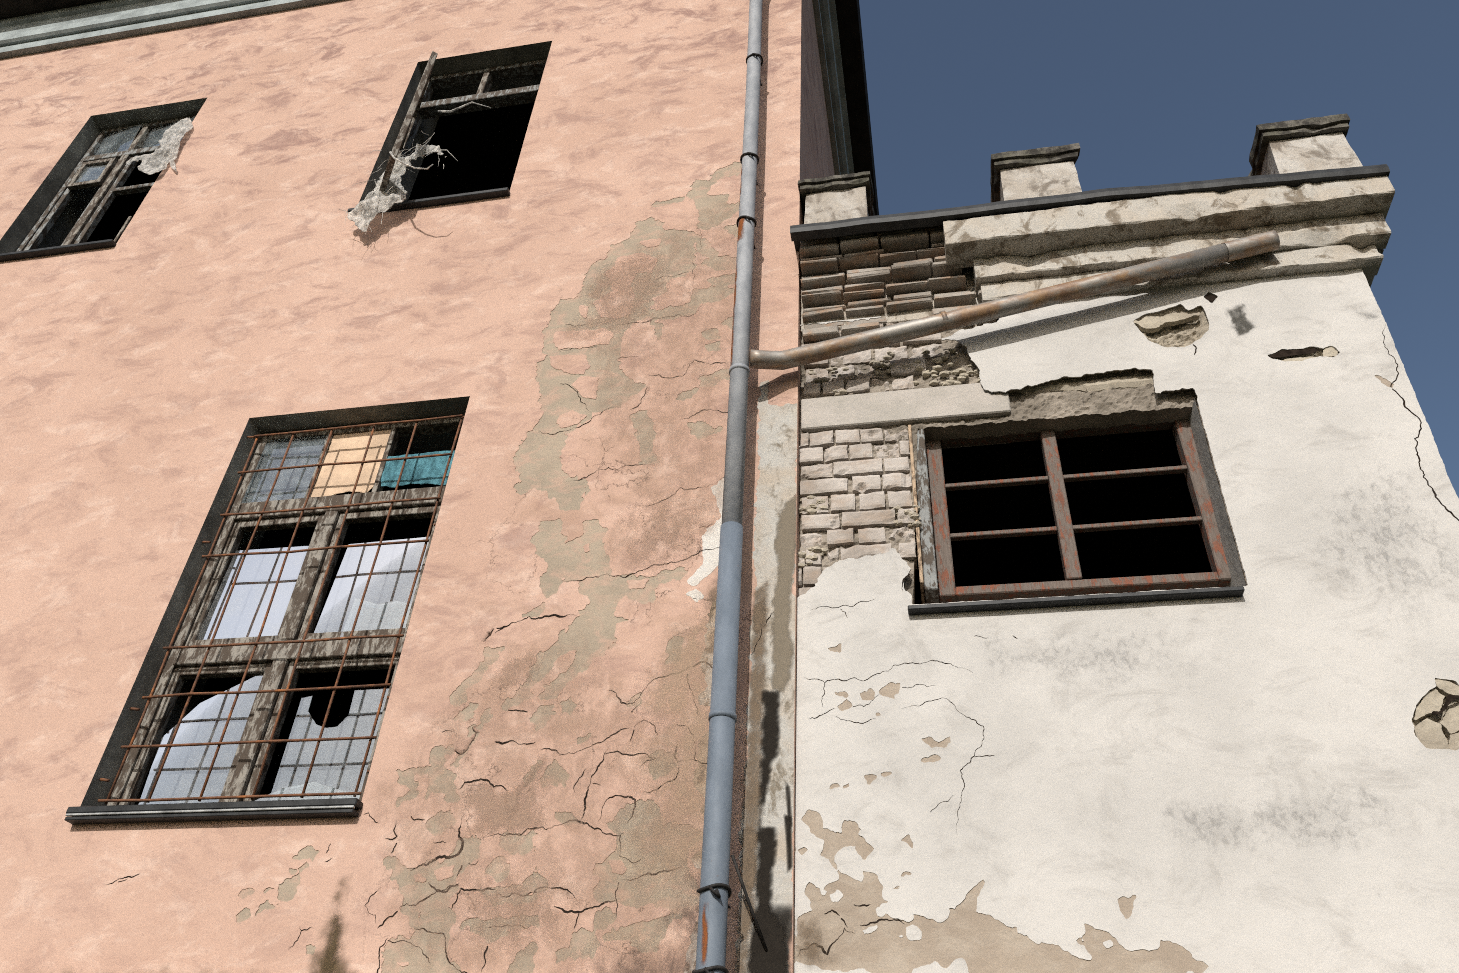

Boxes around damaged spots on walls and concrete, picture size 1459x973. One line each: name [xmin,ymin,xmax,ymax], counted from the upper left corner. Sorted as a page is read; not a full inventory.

flaking render [799,225,982,346]
flaking render [1134,293,1217,347]
flaking render [1269,347,1339,362]
crack [1382,328,1459,521]
spalling [236,846,319,923]
crack [365,661,713,973]
flaking render [381,162,742,973]
crack [809,635,1016,830]
flaking render [735,318,1209,973]
flaking render [1412,679,1459,750]